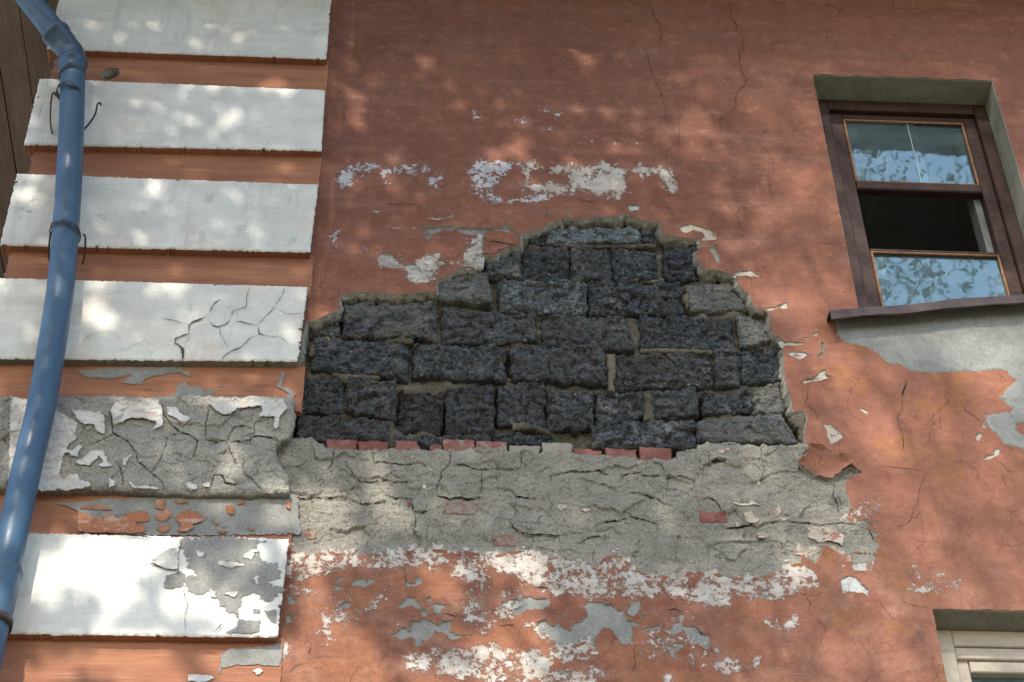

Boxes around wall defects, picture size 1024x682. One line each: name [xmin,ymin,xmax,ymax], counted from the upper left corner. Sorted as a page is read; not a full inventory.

crack [168,286,302,362]
peeling [7,397,28,479]
crack [97,389,289,491]
spalling [38,215,881,634]
crack [298,384,927,581]
peeling [391,578,470,646]
peeling [501,597,709,666]